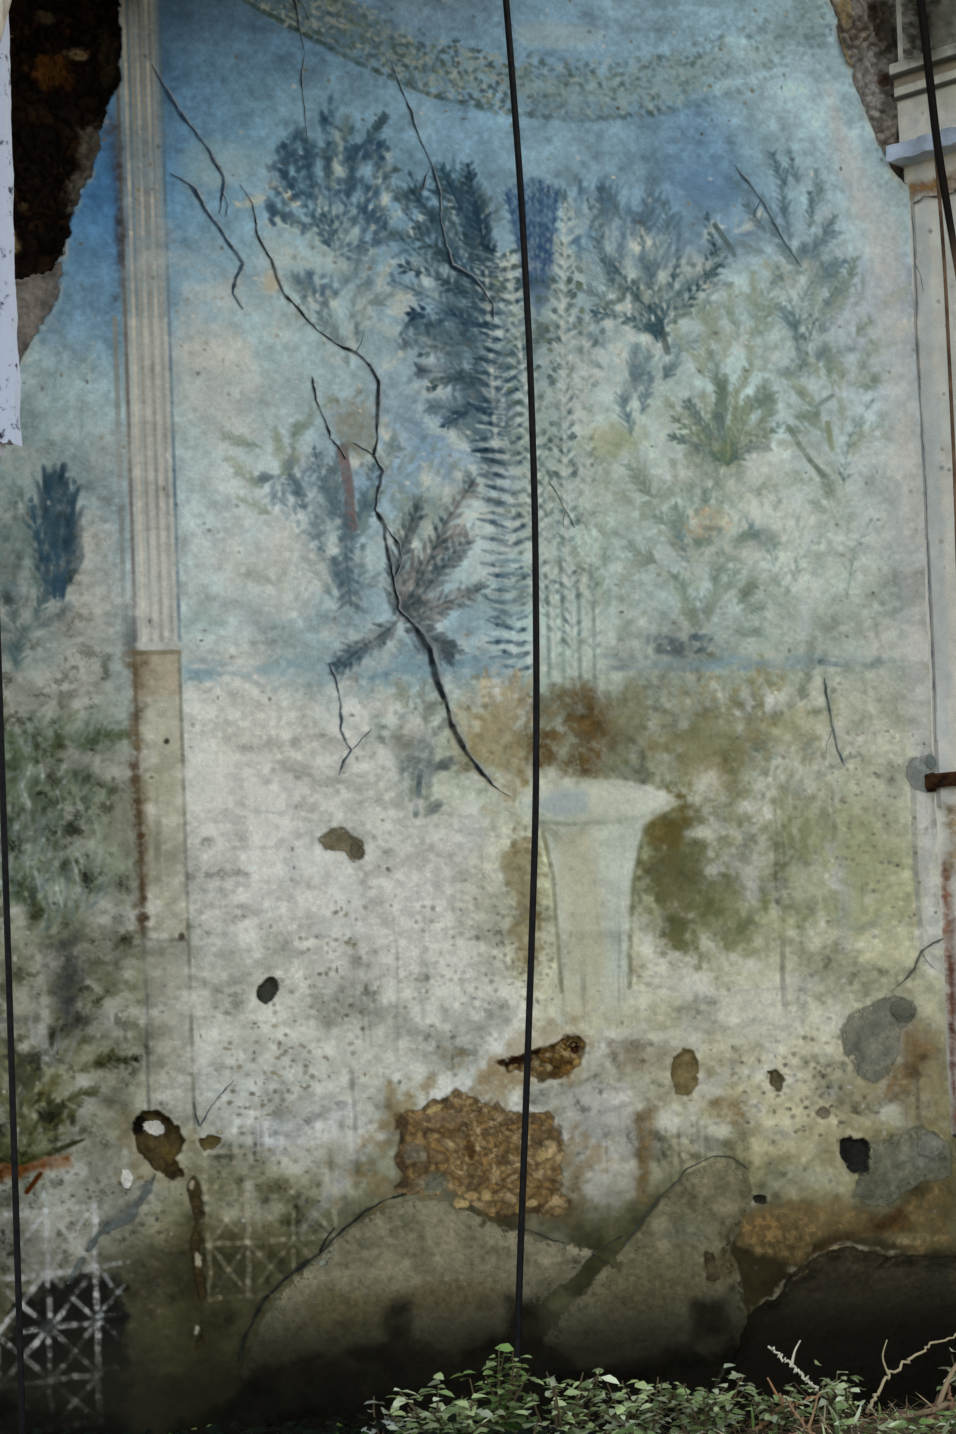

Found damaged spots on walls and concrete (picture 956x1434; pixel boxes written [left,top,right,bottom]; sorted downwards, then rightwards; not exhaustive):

crack [293,0,309,144]
spalling [830,0,907,184]
flaking render [9,0,122,363]
crack [151,60,509,796]
spalling [257,977,284,1004]
spalling [498,1036,585,1082]
spalling [133,1110,222,1300]
crack [238,1194,407,1362]
leakage [171,1297,737,1434]
crack [510,1155,748,1266]
flaking render [720,1244,956,1434]
leakage [741,1183,951,1259]